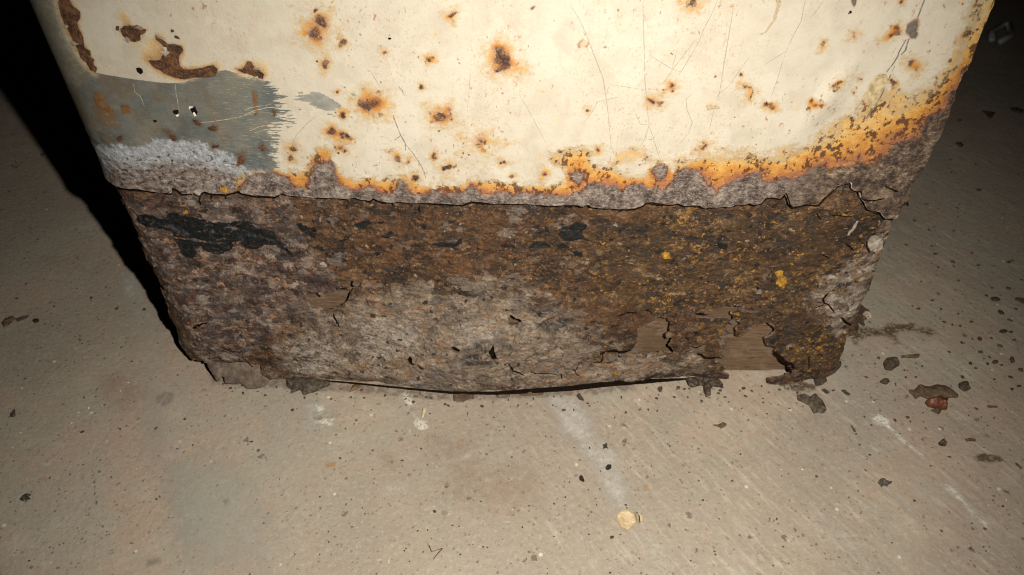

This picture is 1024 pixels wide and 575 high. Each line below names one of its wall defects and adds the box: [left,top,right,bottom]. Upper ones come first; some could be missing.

corrosion [82,0,995,219]
crack [117,184,898,221]
corrosion [773,270,787,290]
spalling [604,316,679,357]
spalling [695,304,787,379]
corrosion [611,371,706,392]